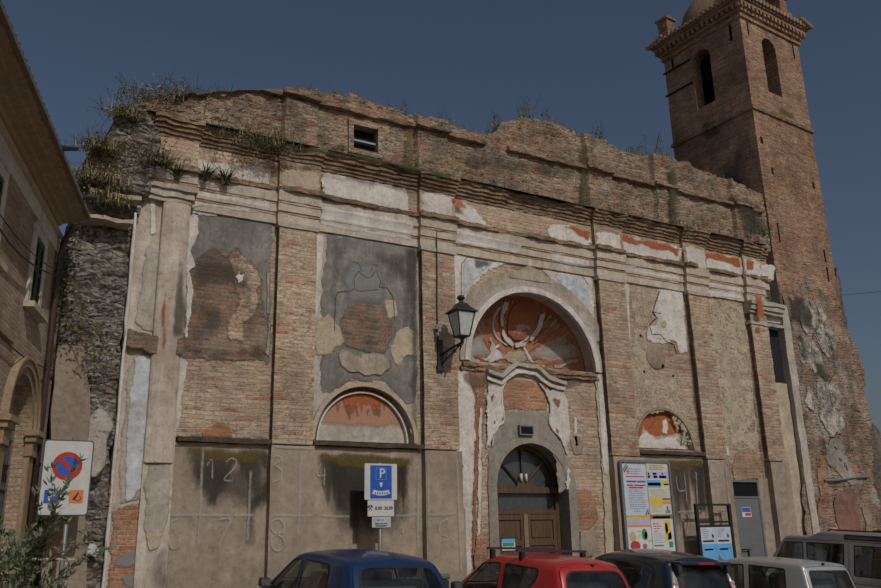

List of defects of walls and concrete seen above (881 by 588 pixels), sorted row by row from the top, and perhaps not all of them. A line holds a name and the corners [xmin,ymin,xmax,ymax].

flaking render [88,200,171,588]
flaking render [176,191,274,430]
leakage [193,454,268,522]
flaking render [198,160,420,438]
leakage [323,460,406,524]
flaking render [420,192,522,303]
flaking render [457,337,578,575]
flaking render [541,253,595,323]
flaking render [625,265,692,450]
flaking render [547,224,775,281]
flaking render [709,283,761,480]